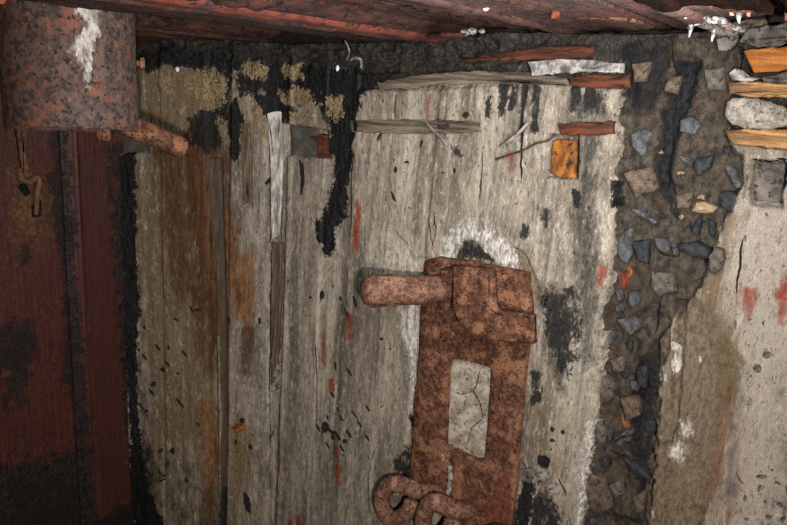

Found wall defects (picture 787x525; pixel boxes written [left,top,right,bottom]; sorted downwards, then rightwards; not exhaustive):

water stain [139,43,400,257]
water stain [538,135,627,376]
spalling [583,30,745,525]
water stain [530,369,543,405]
water stain [513,420,602,525]